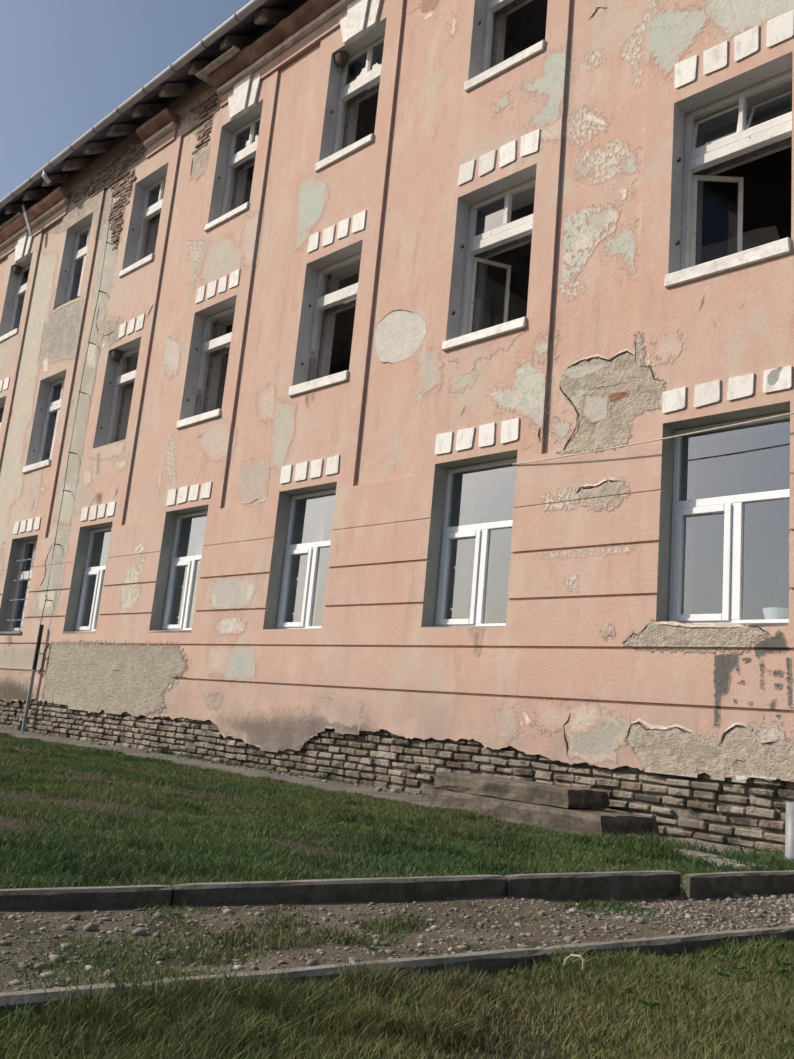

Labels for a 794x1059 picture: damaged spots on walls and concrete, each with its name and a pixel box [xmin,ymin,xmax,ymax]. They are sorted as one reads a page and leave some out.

flaking render [178,87,221,183]
peeling [490,0,794,303]
flaking render [0,137,147,620]
flaking render [485,327,686,455]
flaking render [539,476,630,512]
flaking render [41,640,189,718]
flaking render [598,619,771,655]
water stain [712,630,793,728]
flaking render [529,693,794,783]